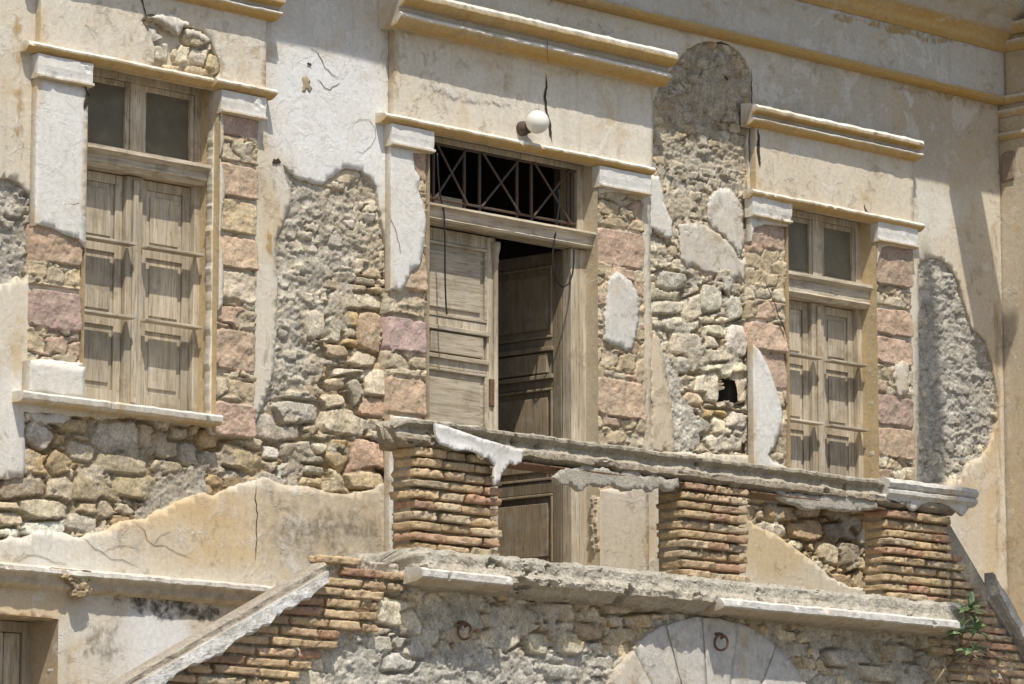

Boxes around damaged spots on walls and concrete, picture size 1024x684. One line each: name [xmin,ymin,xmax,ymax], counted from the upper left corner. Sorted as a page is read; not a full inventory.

flaking render [141,12,219,78]
crack [544,41,552,139]
flaking render [598,42,789,468]
flaking render [0,114,525,540]
flaking render [859,246,998,483]
crack [87,526,189,565]
flaking render [590,486,618,553]
flaking render [746,499,865,588]